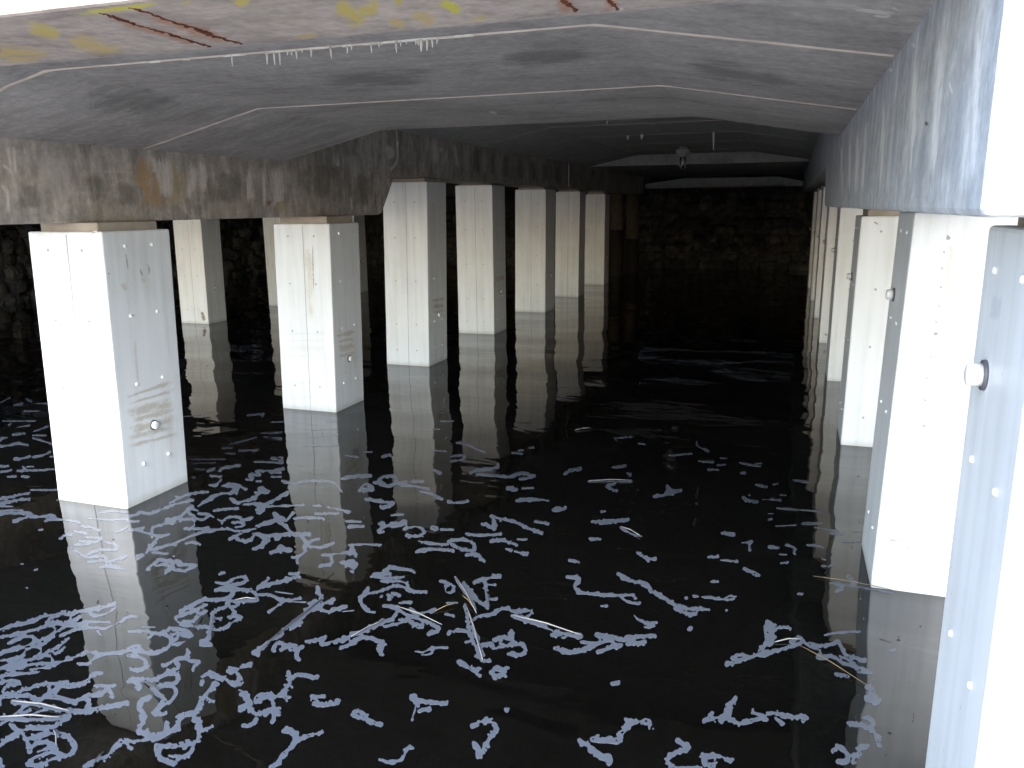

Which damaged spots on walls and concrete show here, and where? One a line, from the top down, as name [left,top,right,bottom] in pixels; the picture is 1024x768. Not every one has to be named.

water stain [264,0,492,97]